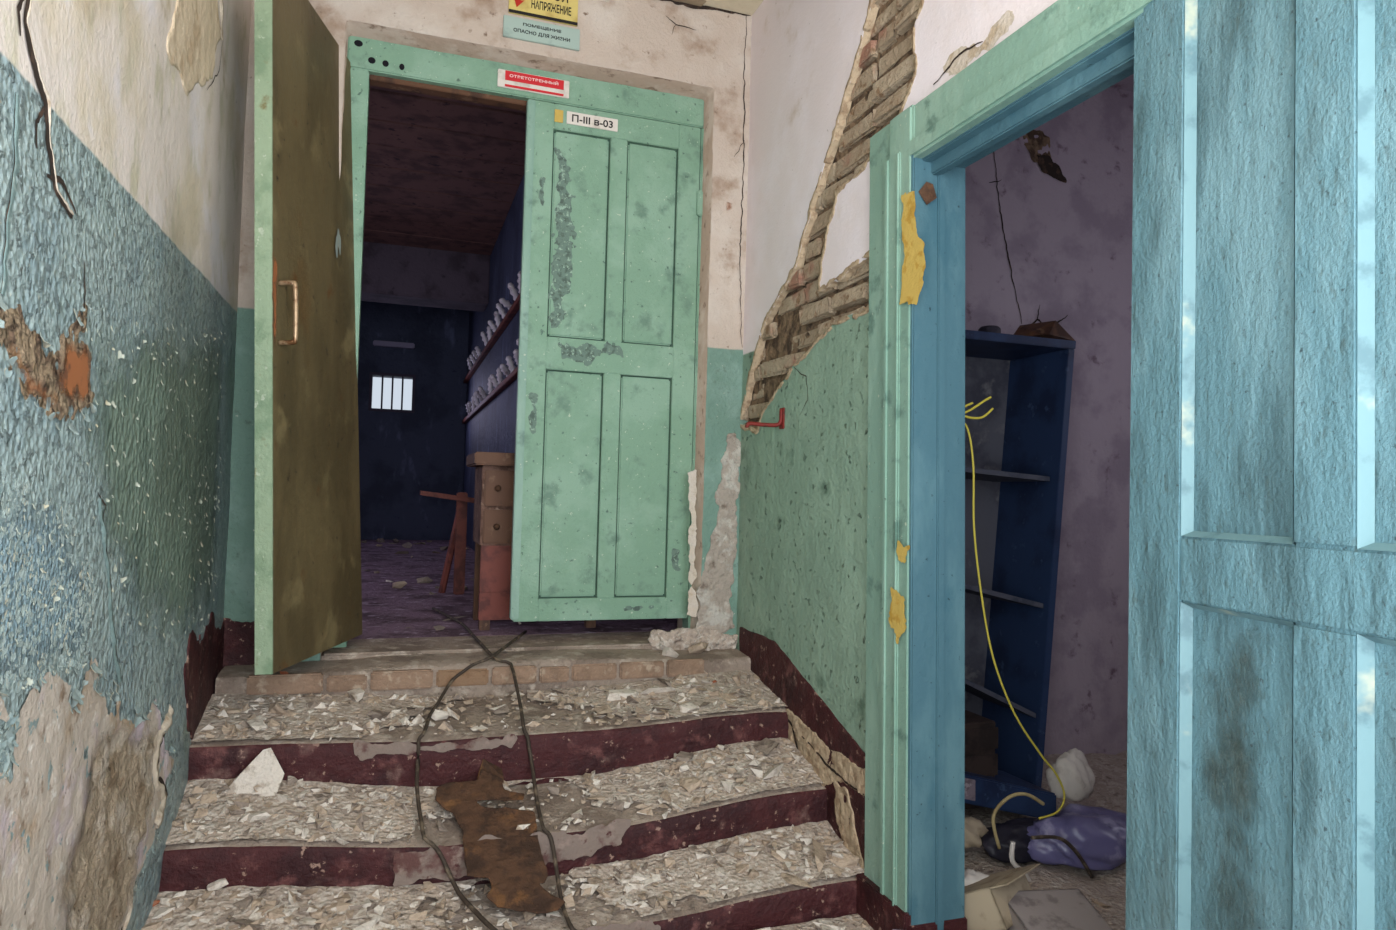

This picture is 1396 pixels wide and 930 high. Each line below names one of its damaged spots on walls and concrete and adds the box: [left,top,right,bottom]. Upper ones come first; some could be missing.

crack [0,0,76,296]
peeling [0,294,226,930]
spalling [647,0,926,651]
peeling [943,10,1014,76]